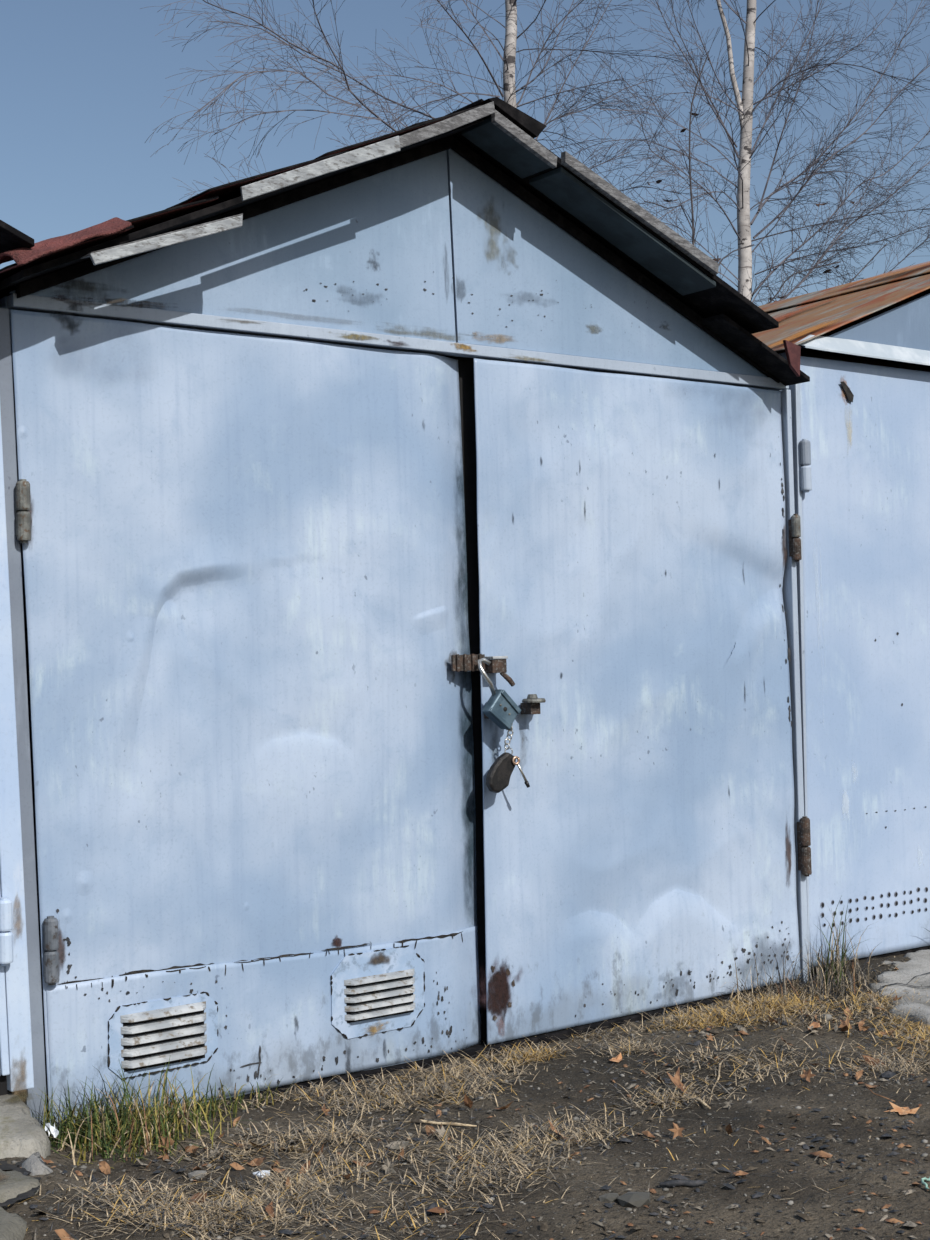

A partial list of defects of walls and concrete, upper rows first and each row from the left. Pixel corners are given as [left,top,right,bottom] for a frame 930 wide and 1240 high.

rust [774,261,930,321]
rust [768,320,835,347]
rust [840,381,854,402]
rust [370,952,390,964]
rust [484,966,515,1025]